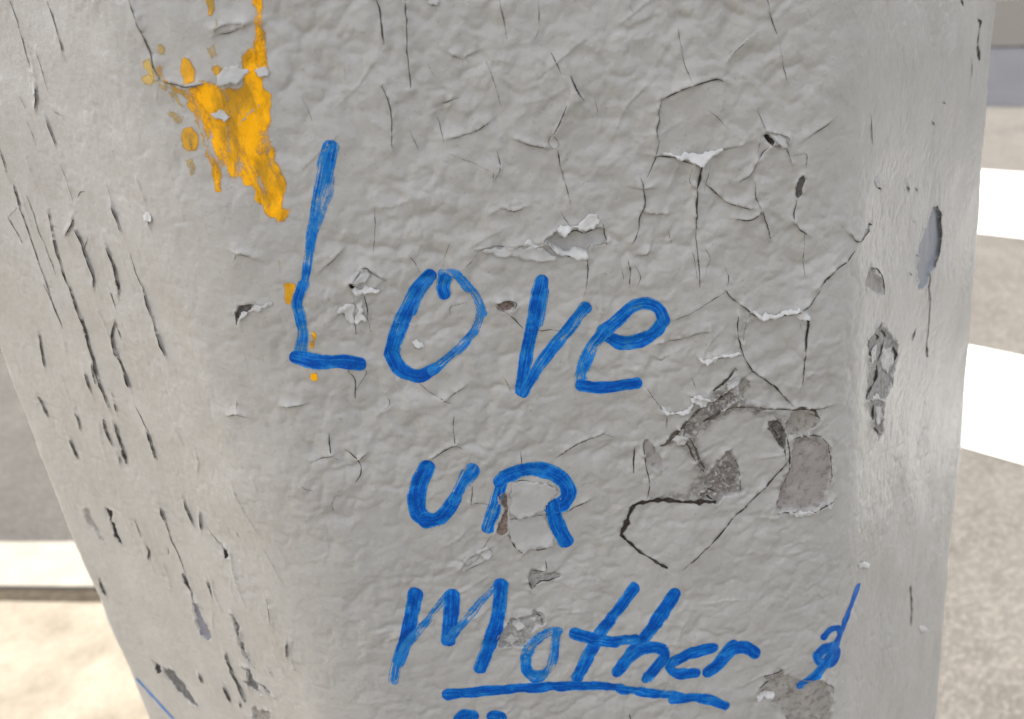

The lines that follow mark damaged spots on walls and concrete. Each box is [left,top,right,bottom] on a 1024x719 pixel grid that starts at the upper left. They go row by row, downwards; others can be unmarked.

crack [129,1,203,88]
crack [376,0,433,150]
crack [1,0,165,463]
crack [496,301,557,331]
peeling [463,212,607,286]
crack [616,0,873,472]
peeling [910,206,943,357]
peeling [866,323,898,437]
peeling [690,377,835,517]
peeling [463,480,560,589]
crack [686,463,787,568]
peeling [756,669,834,719]